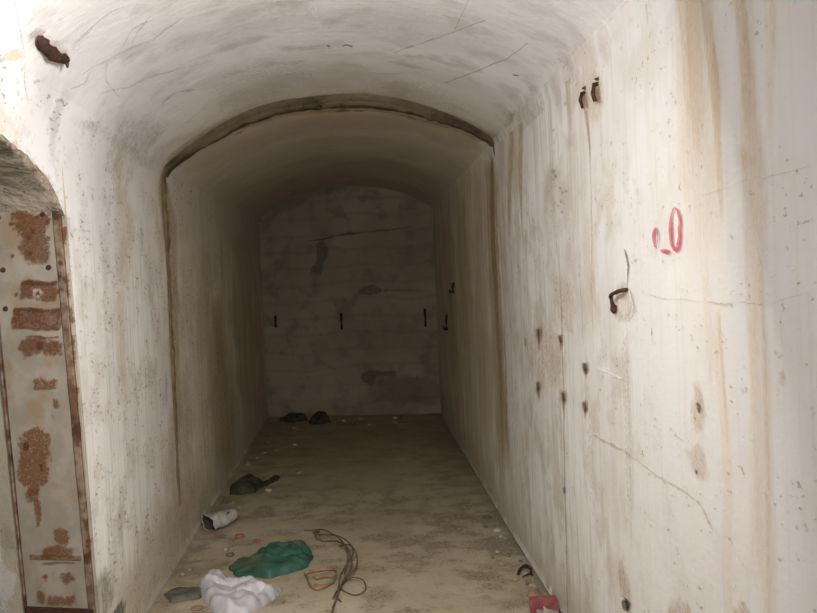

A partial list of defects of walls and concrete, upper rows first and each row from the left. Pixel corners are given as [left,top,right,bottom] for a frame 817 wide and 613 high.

corrosion [578,77,599,109]
corrosion [12,274,76,363]
corrosion [34,378,56,390]
corrosion [17,427,52,525]
corrosion [43,528,76,564]
corrosion [37,591,75,606]